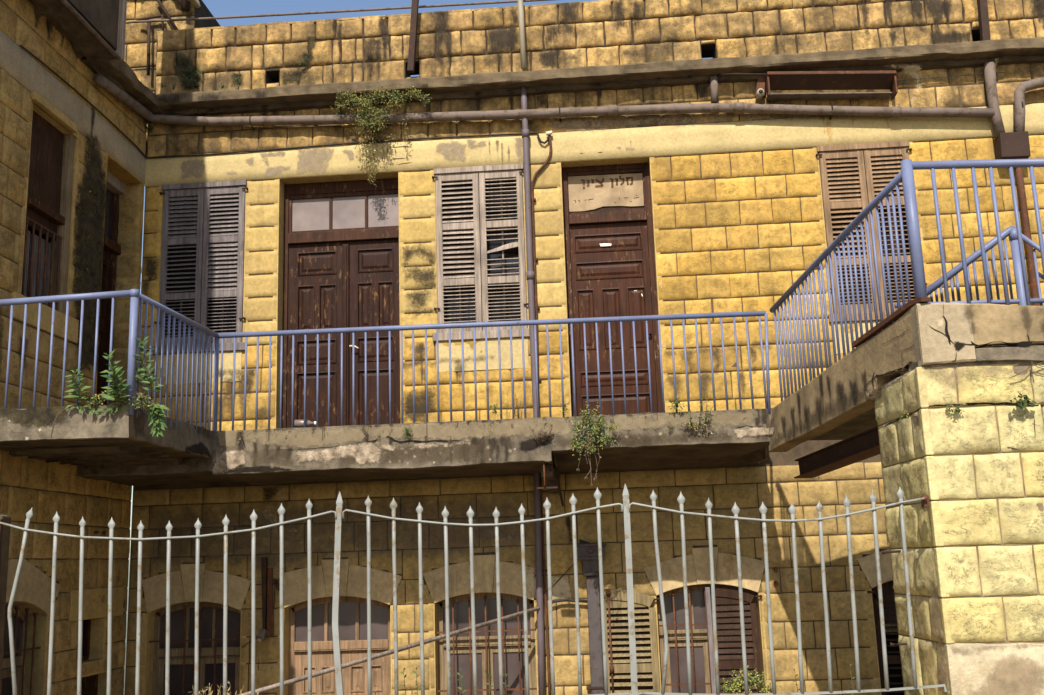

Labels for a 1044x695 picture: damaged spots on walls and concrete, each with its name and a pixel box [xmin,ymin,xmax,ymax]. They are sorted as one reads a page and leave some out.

water stain [365,17,389,79]
water stain [435,11,452,74]
water stain [540,2,579,67]
water stain [913,0,970,44]
water stain [1034,0,1044,22]
flaking render [181,160,204,178]
flaking render [247,152,290,177]
flaking render [437,140,486,161]
crack [867,305,1044,391]
flaking render [185,418,571,474]
flaking render [605,410,774,439]
water stain [976,658,1044,695]